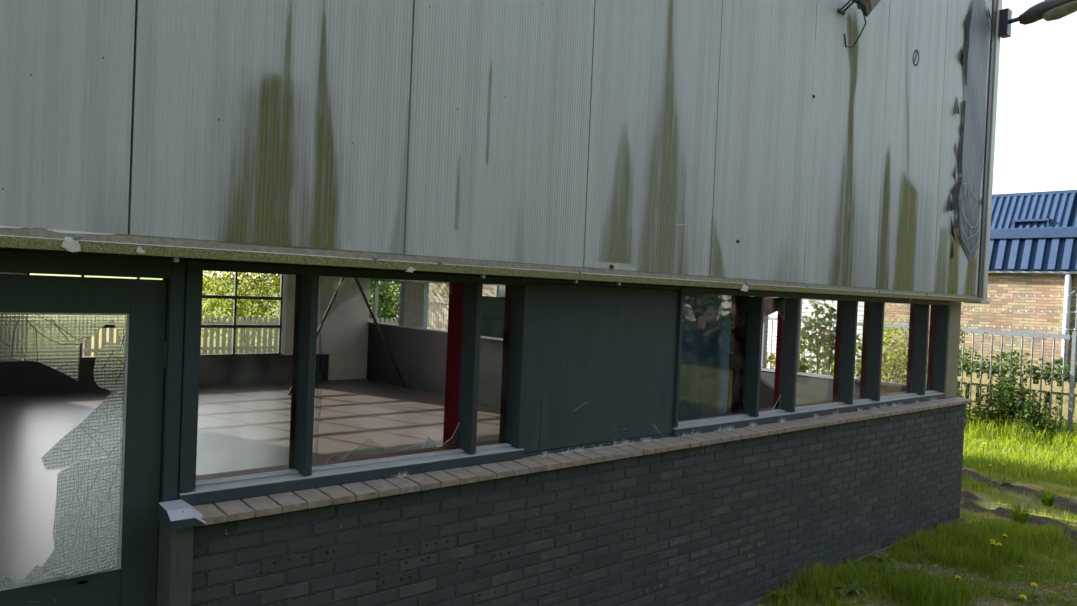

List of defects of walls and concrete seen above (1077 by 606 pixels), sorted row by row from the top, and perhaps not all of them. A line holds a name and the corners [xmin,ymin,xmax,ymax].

damp [820,7,925,291]